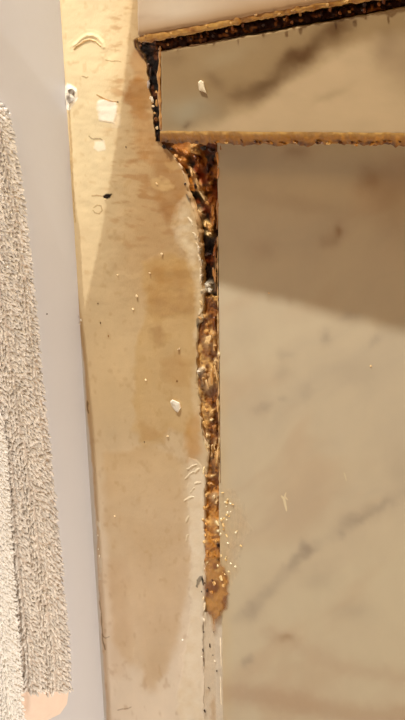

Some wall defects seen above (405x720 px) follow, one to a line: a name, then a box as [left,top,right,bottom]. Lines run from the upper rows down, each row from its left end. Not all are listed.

water stain [99,251,206,697]
corrosion [202,558,228,623]